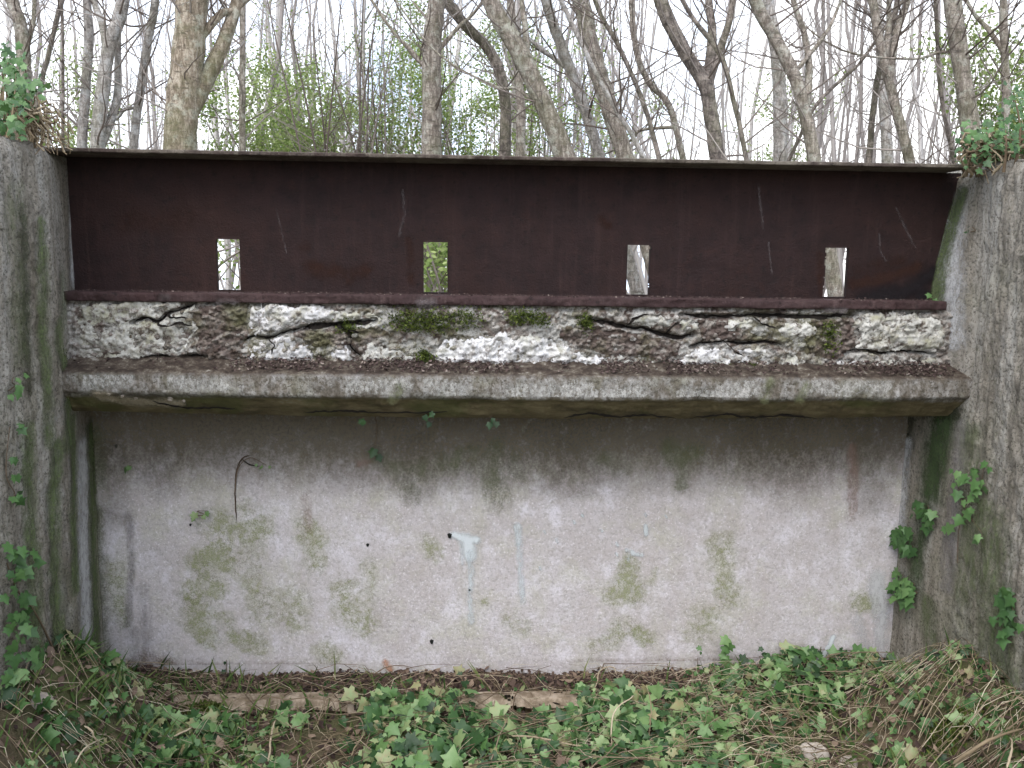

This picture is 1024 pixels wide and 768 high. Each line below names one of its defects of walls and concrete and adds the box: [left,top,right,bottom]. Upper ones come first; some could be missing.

water stain [20,203,33,393]
crack [135,303,195,327]
crack [246,319,376,355]
peeling [77,301,945,366]
crack [591,312,850,356]
crack [848,347,929,355]
water stain [856,217,963,348]
crack [153,401,235,409]
water stain [78,411,912,641]